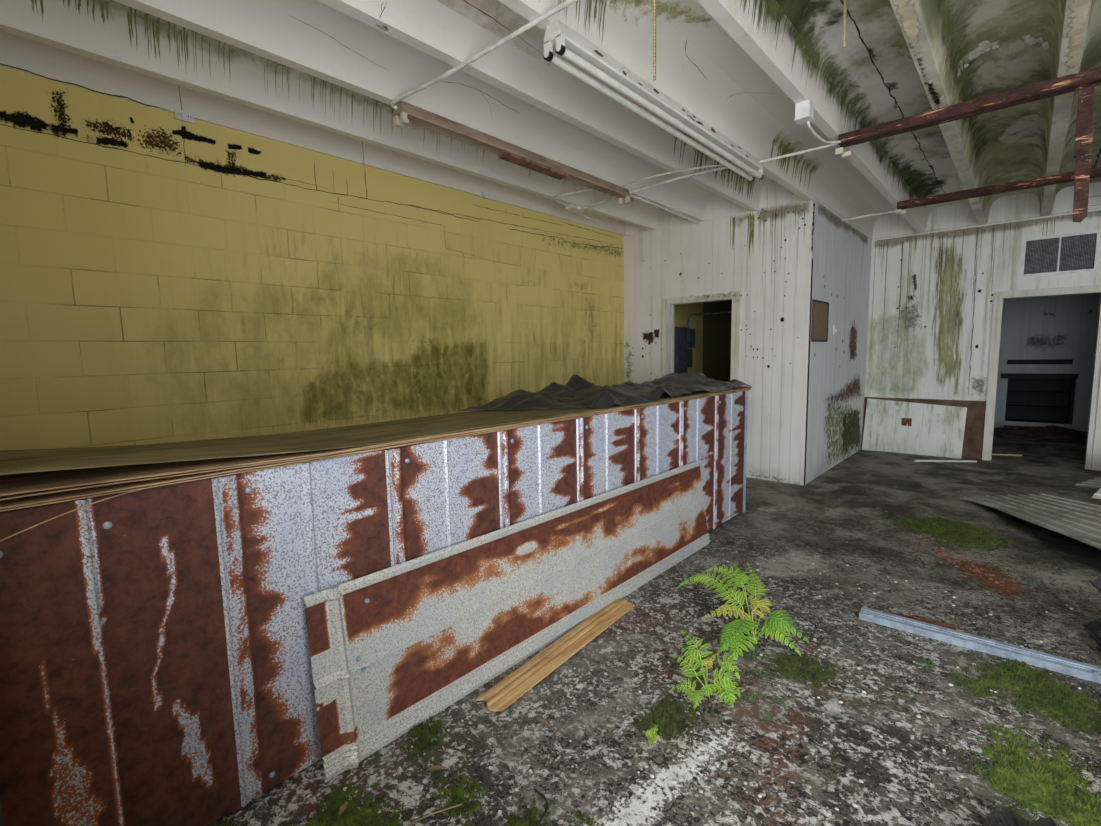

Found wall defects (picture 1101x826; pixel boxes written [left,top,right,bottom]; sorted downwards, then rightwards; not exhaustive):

damp [63,0,114,22]
damp [127,7,237,77]
damp [264,62,394,130]
damp [558,0,607,39]
damp [741,0,875,130]
crack [840,0,946,193]
damp [937,0,999,102]
damp [0,88,286,181]
damp [674,135,755,199]
damp [771,135,816,188]
damp [869,138,915,199]
damp [730,203,1073,333]